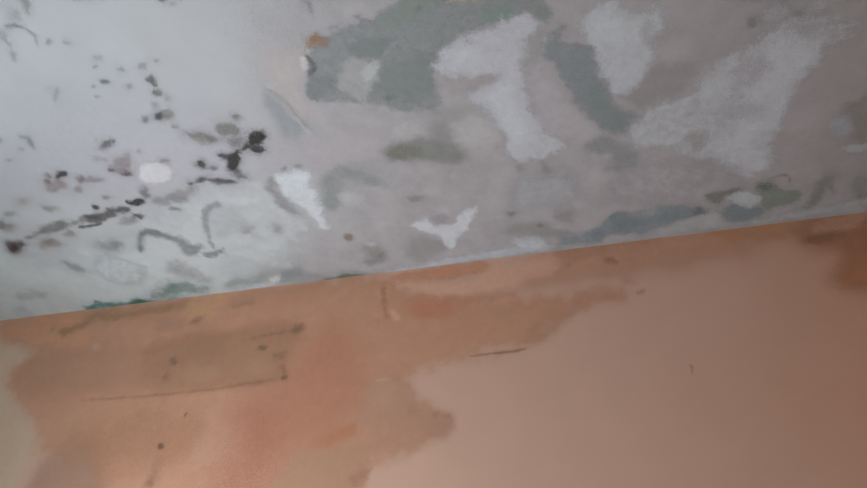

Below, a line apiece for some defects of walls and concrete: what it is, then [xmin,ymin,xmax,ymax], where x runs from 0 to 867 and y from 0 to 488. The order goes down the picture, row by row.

flaking render [297,0,556,114]
water stain [0,0,867,359]